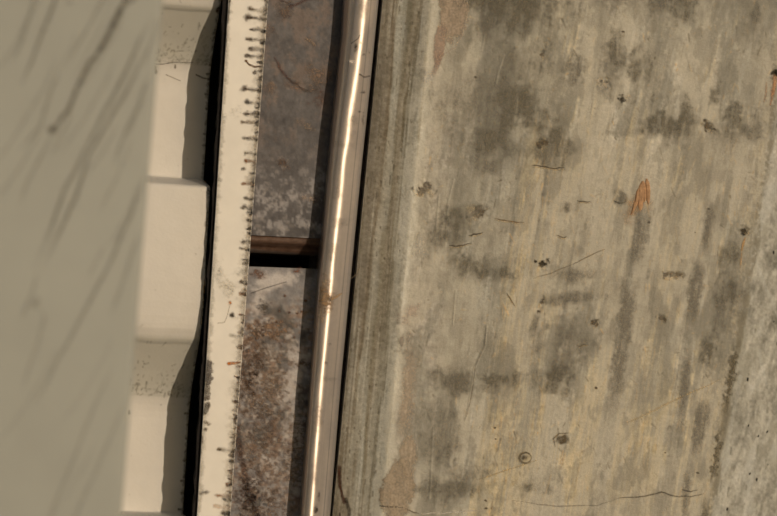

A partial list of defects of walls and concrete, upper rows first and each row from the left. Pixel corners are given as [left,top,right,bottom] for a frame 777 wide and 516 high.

leakage [470,87,569,171]
leakage [642,103,691,136]
leakage [703,213,712,244]
leakage [688,267,703,313]
leakage [614,299,634,387]
leakage [723,353,737,403]
rust [227,300,311,516]
leakage [694,412,708,447]